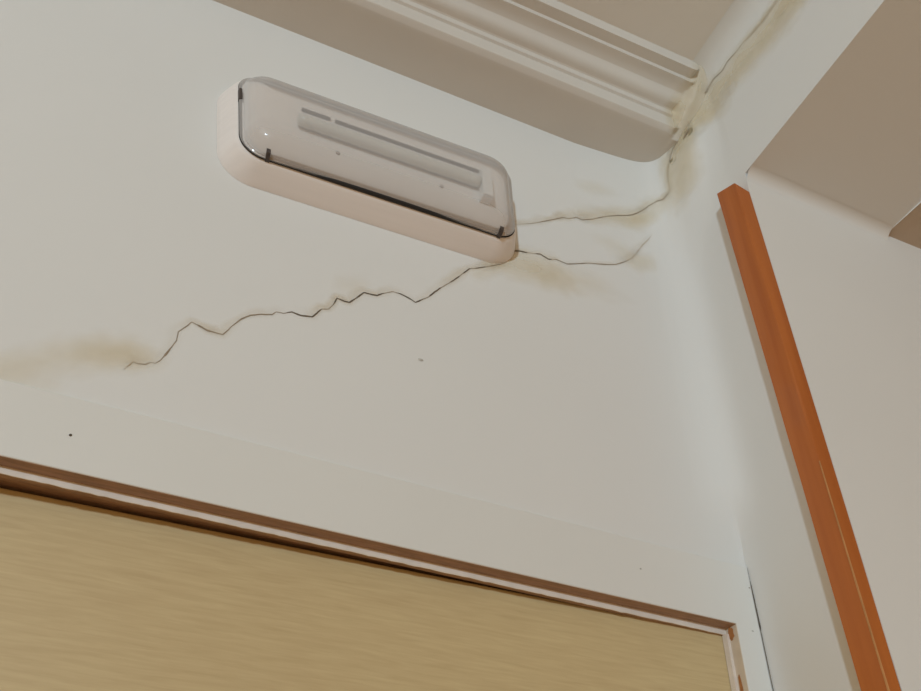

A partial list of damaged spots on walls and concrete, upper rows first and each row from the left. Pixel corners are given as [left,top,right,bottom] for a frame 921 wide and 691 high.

crack [526,121,689,224]
crack [128,236,651,366]